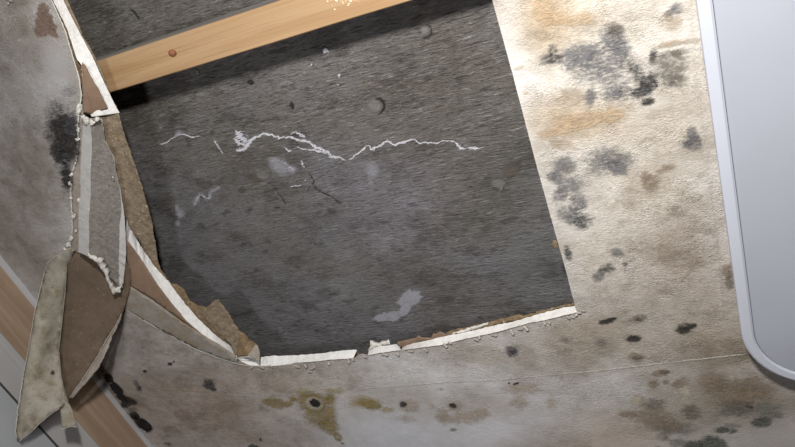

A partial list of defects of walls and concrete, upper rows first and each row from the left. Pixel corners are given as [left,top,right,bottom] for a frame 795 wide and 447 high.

water stain [665,4,680,29]
water stain [543,24,699,105]
water stain [45,100,80,189]
crack [160,130,483,208]
water stain [540,90,629,228]
water stain [641,165,671,189]
water stain [684,127,704,146]
peeling [124,287,273,370]
water stain [99,366,152,433]
water stain [263,389,343,444]
water stain [351,398,418,421]
water stain [621,374,781,447]